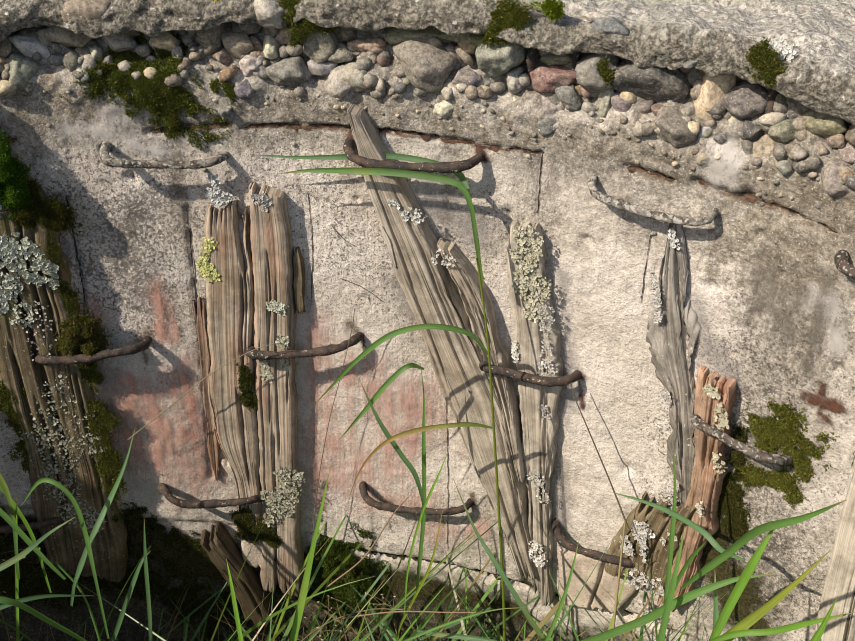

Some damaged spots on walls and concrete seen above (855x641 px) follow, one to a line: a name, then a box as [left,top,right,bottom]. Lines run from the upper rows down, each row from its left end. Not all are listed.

rust [265,125,352,138]
crack [66,198,86,316]
rust [802,382,845,424]